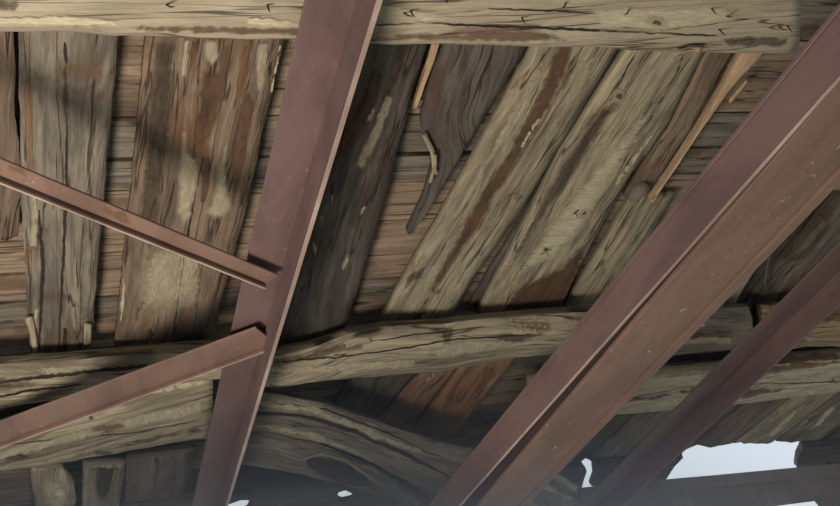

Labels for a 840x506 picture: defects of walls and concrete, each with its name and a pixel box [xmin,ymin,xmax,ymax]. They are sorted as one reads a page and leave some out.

damp [140,46,173,220]
damp [201,158,210,203]
damp [196,50,230,144]
damp [232,96,253,192]
crack [0,364,148,398]
crack [273,331,532,363]